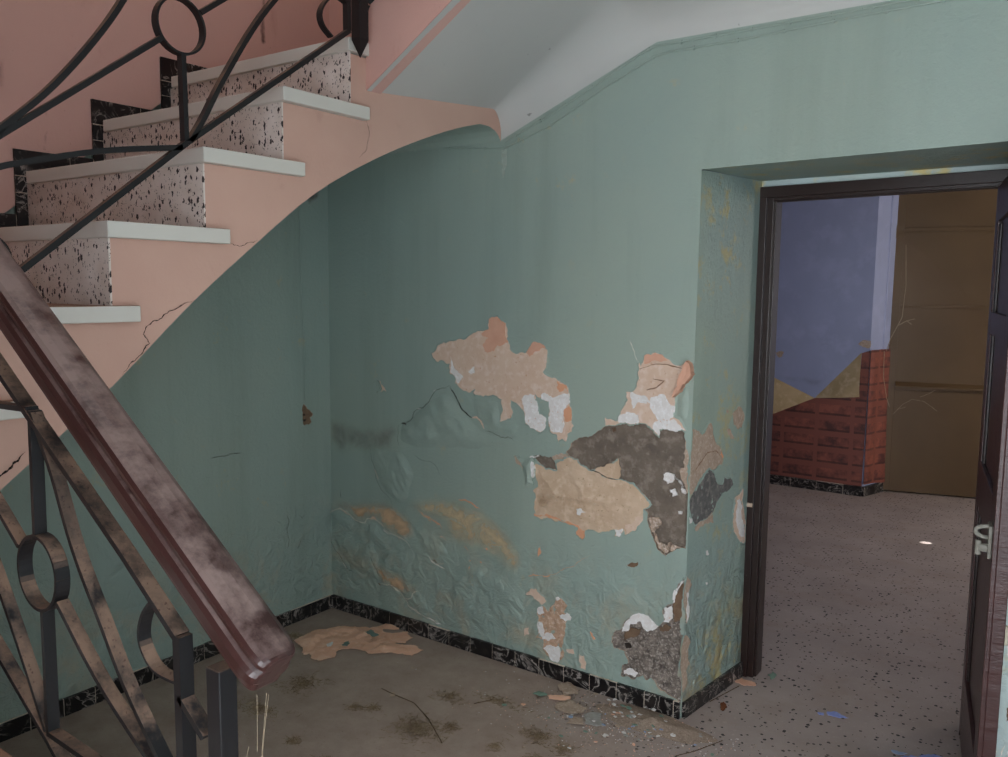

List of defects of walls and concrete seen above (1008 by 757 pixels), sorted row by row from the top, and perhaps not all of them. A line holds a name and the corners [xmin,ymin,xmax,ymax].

crack [124,300,195,372]
crack [397,386,512,440]
peeling [432,315,746,556]
peeling [523,587,586,670]
spalling [611,576,692,701]